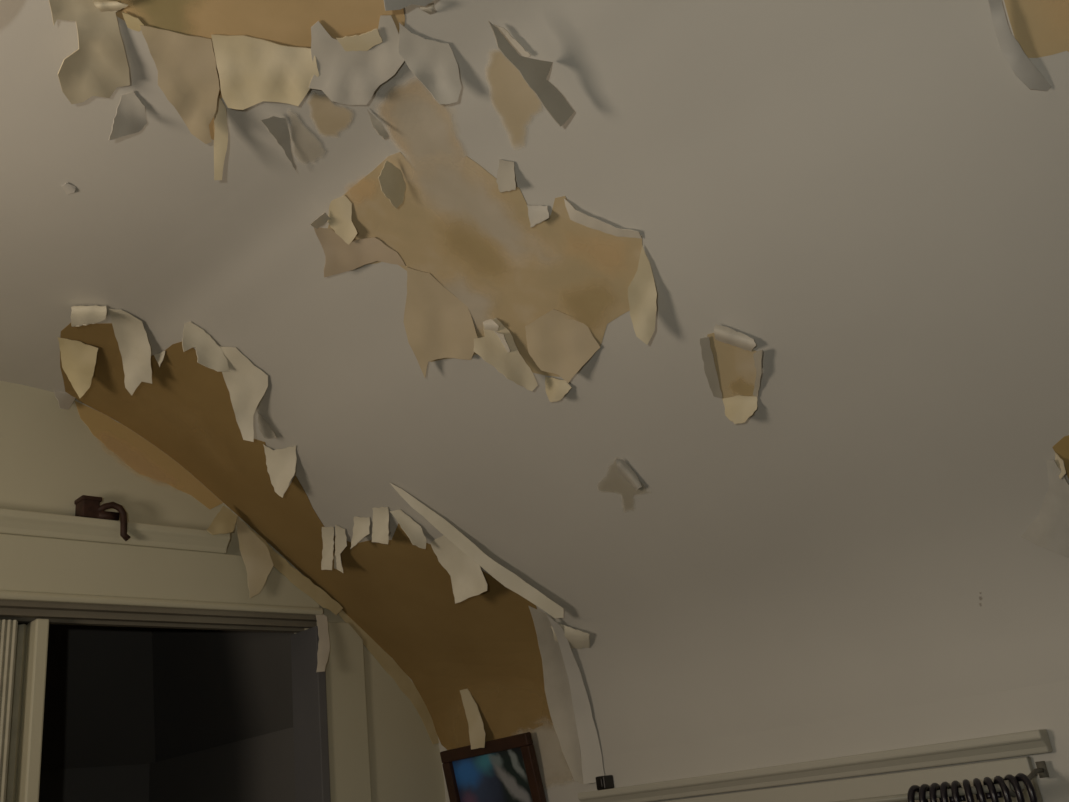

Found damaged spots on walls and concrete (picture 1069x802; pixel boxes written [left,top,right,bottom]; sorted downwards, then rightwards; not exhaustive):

peeling [988,0,1069,91]
peeling [49,0,657,402]
peeling [700,324,763,424]
peeling [54,305,605,787]
spalling [598,459,646,511]
peeling [1021,435,1069,558]